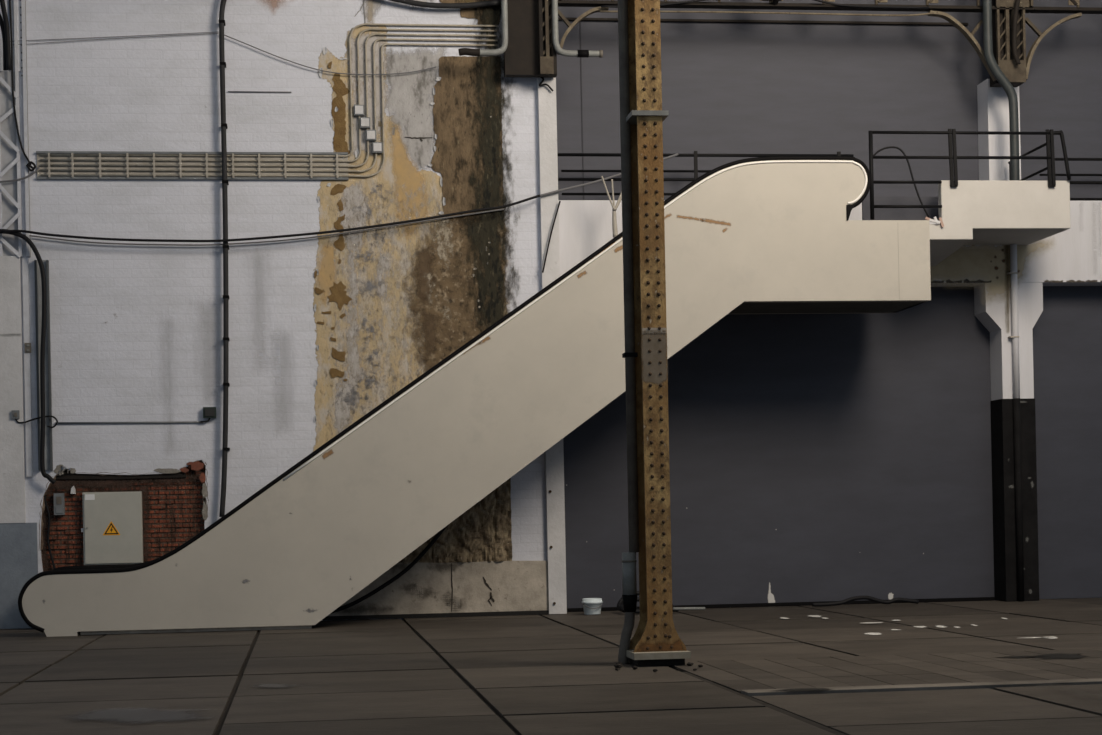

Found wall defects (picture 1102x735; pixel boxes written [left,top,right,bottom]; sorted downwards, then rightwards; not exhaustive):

spalling [440,0,484,25]
peeling [313,25,503,451]
corrosion [637,639,684,652]